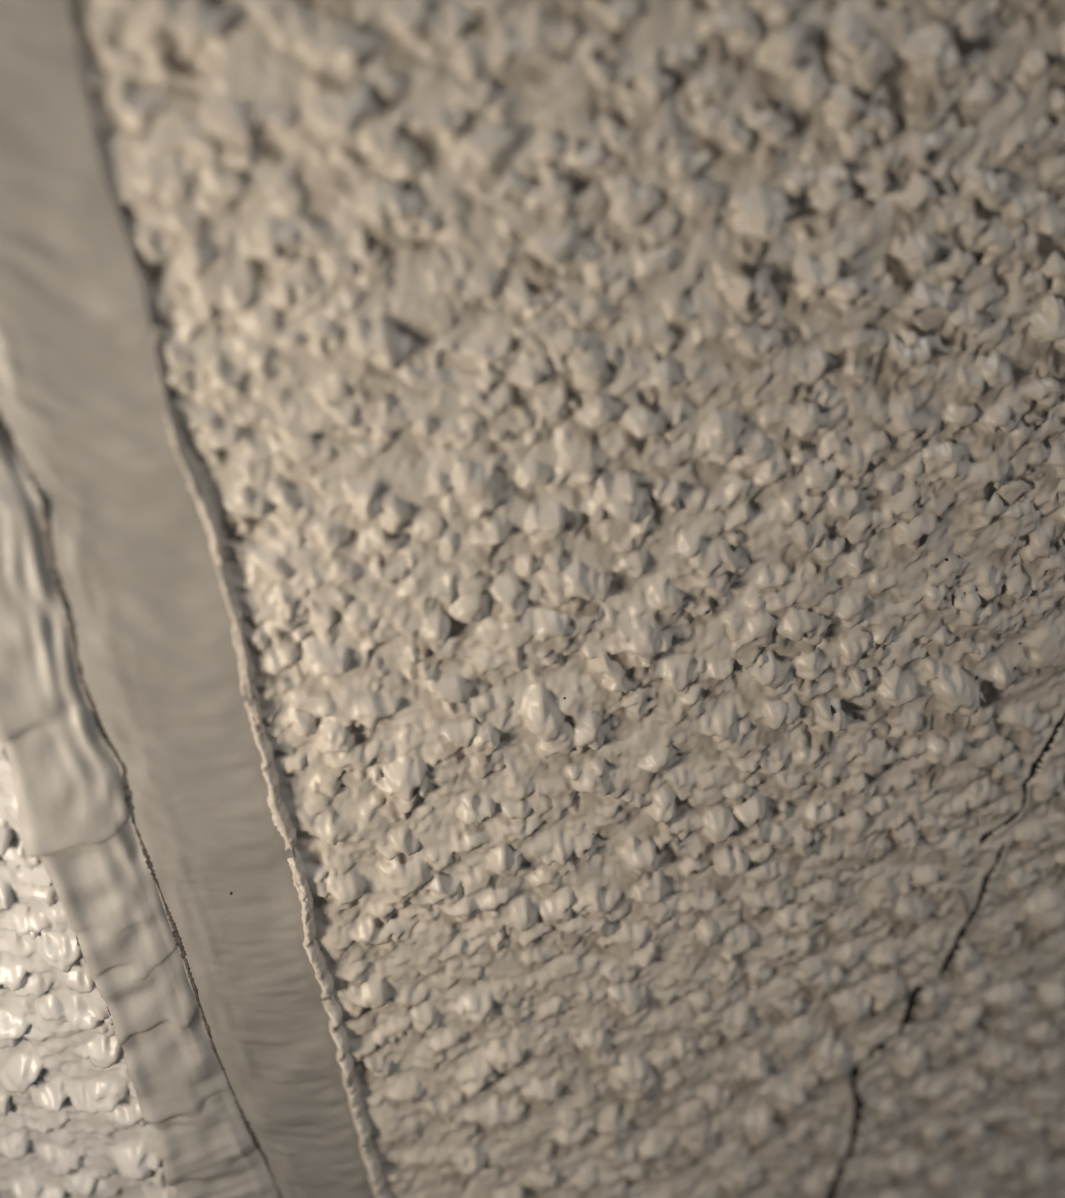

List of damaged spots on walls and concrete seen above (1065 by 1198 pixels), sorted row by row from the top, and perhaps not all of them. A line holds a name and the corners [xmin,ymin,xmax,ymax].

crack [827,714,1065,1198]